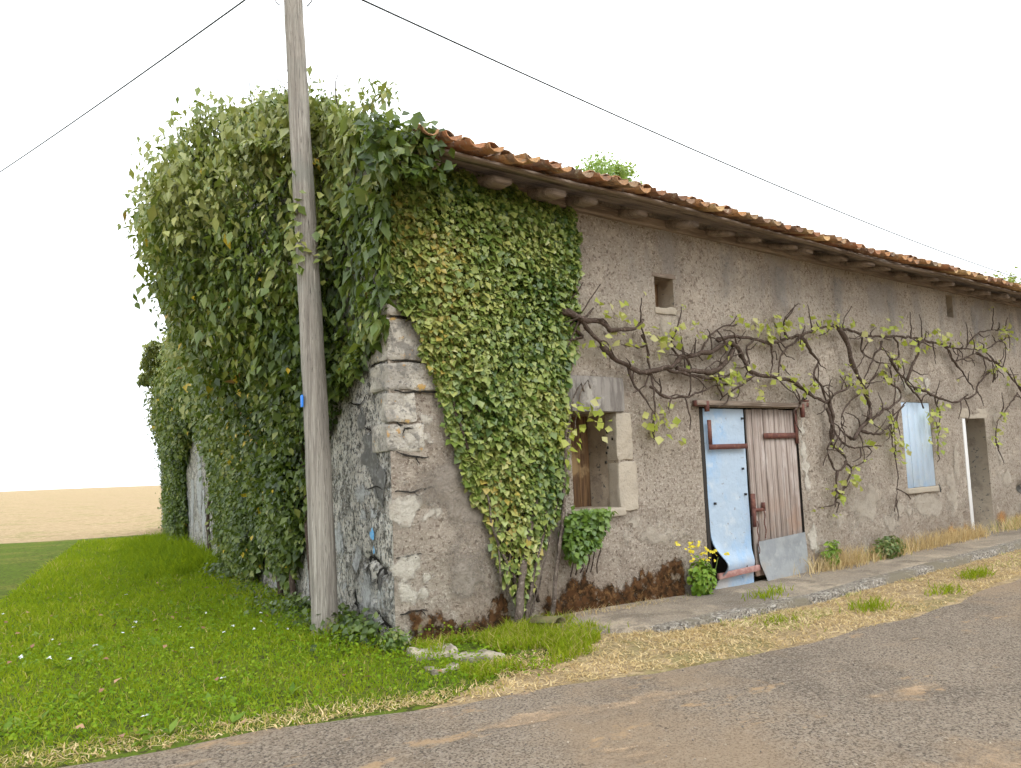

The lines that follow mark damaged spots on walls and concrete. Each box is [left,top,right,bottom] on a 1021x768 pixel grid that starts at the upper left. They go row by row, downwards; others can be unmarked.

crack [354,553,427,634]